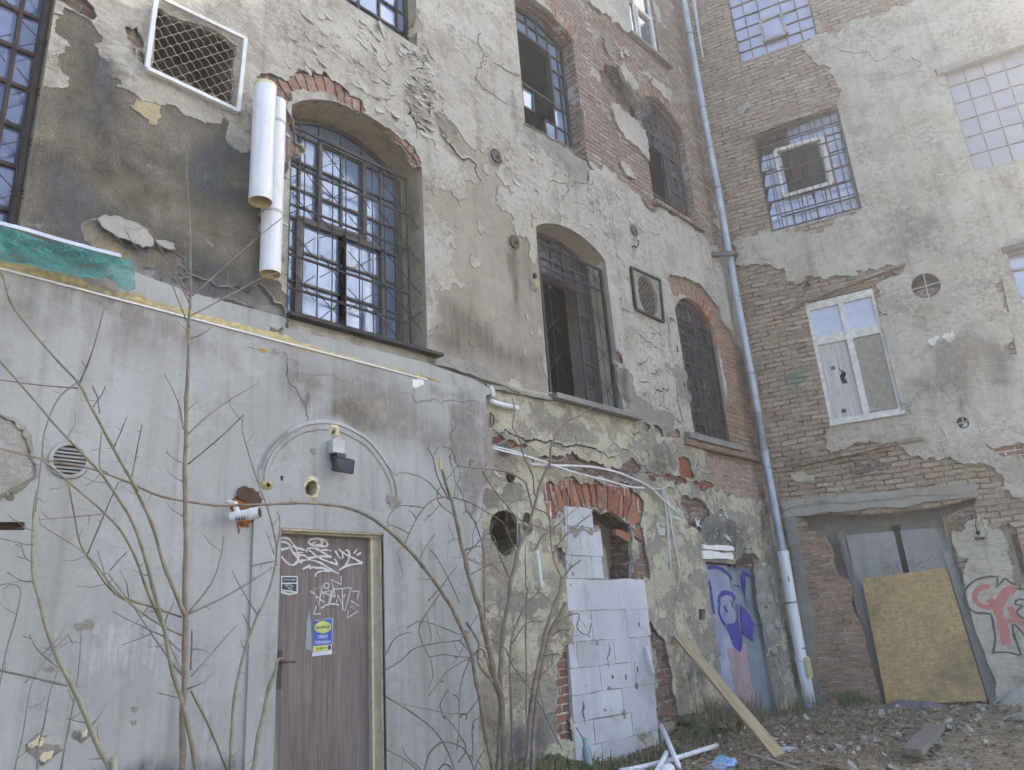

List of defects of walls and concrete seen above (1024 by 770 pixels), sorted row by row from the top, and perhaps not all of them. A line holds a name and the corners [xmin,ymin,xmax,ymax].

flaking render [53,0,97,21]
flaking render [126,27,146,65]
peeling [130,99,162,125]
flaking render [482,121,656,236]
flaking render [81,218,287,335]
crack [284,296,728,548]
peeling [0,413,39,501]
flaking render [986,441,1024,458]
peeling [483,482,533,535]
flaking render [491,351,792,697]
flaking render [25,733,63,766]